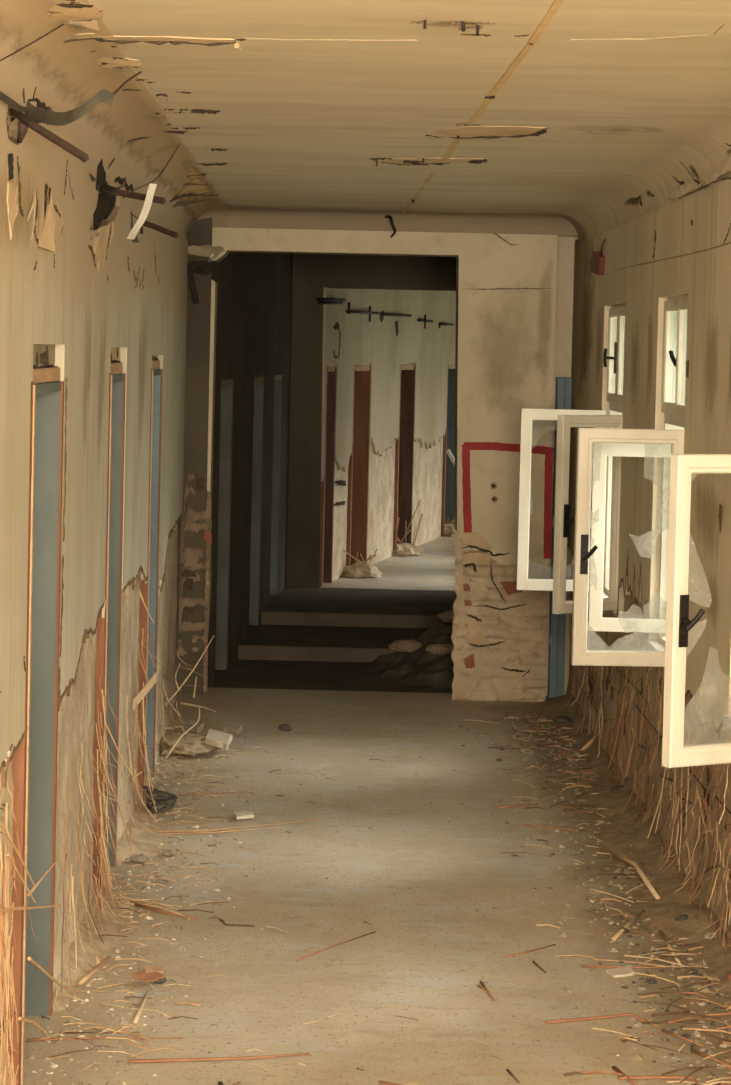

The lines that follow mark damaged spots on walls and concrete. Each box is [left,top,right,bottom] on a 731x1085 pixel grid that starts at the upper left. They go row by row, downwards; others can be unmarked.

crack [571,24,725,40]
crack [64,33,417,50]
spalling [426,124,548,139]
peeling [0,0,229,281]
spalling [369,158,487,166]
spalling [451,528,549,702]
spalling [0,726,28,1085]